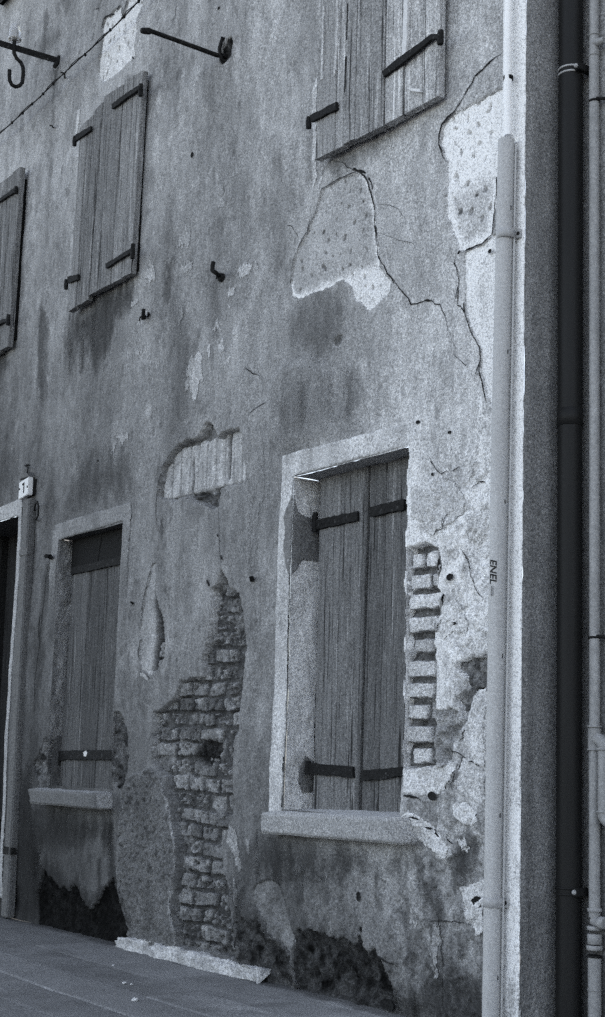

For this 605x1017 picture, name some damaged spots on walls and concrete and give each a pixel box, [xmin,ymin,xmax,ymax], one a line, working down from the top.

spalling [99,0,143,82]
spalling [291,0,391,310]
crack [288,159,497,400]
crack [438,55,499,160]
spalling [441,90,503,404]
spalling [164,425,246,507]
spalling [140,563,166,680]
spalling [403,473,490,826]
spalling [156,584,395,1012]
peeling [402,810,470,861]